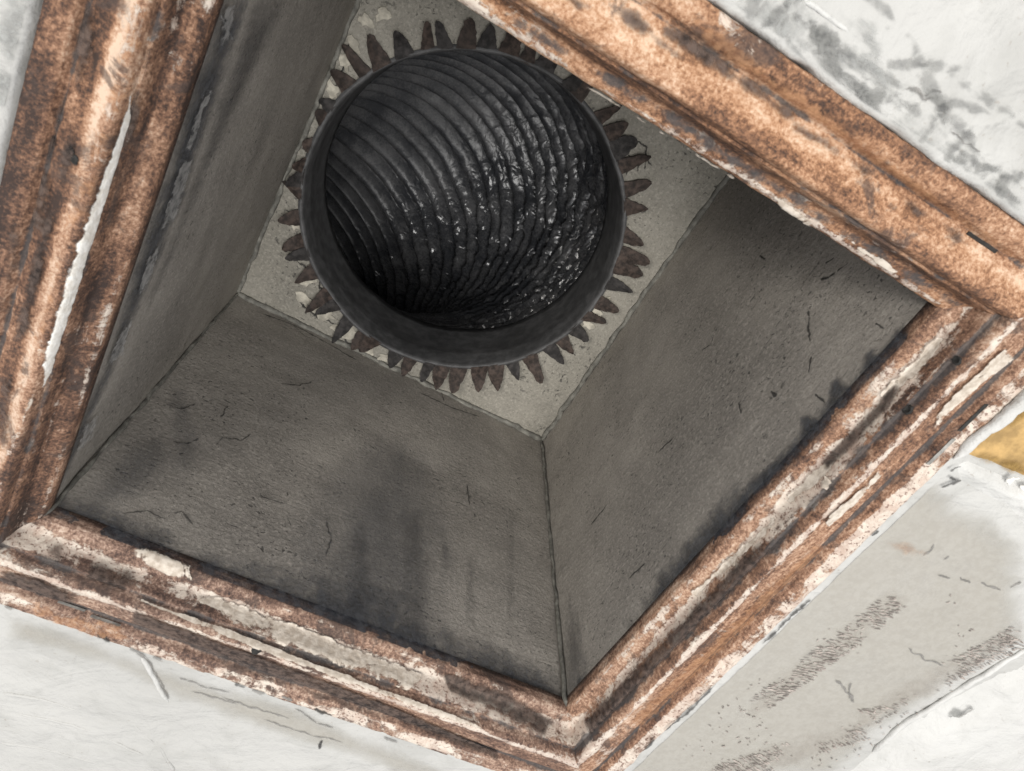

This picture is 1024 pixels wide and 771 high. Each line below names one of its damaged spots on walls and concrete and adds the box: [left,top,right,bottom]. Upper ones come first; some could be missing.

corrosion [622,9,648,32]
corrosion [663,28,793,118]
peeling [42,96,132,386]
damp [651,331,905,604]
corrosion [823,386,898,467]
peeling [935,350,1013,427]
flaking render [953,389,1024,475]
damp [60,509,159,551]
peeling [135,549,192,580]
peeling [141,597,481,728]
damp [203,562,547,691]
corrosion [585,547,766,733]